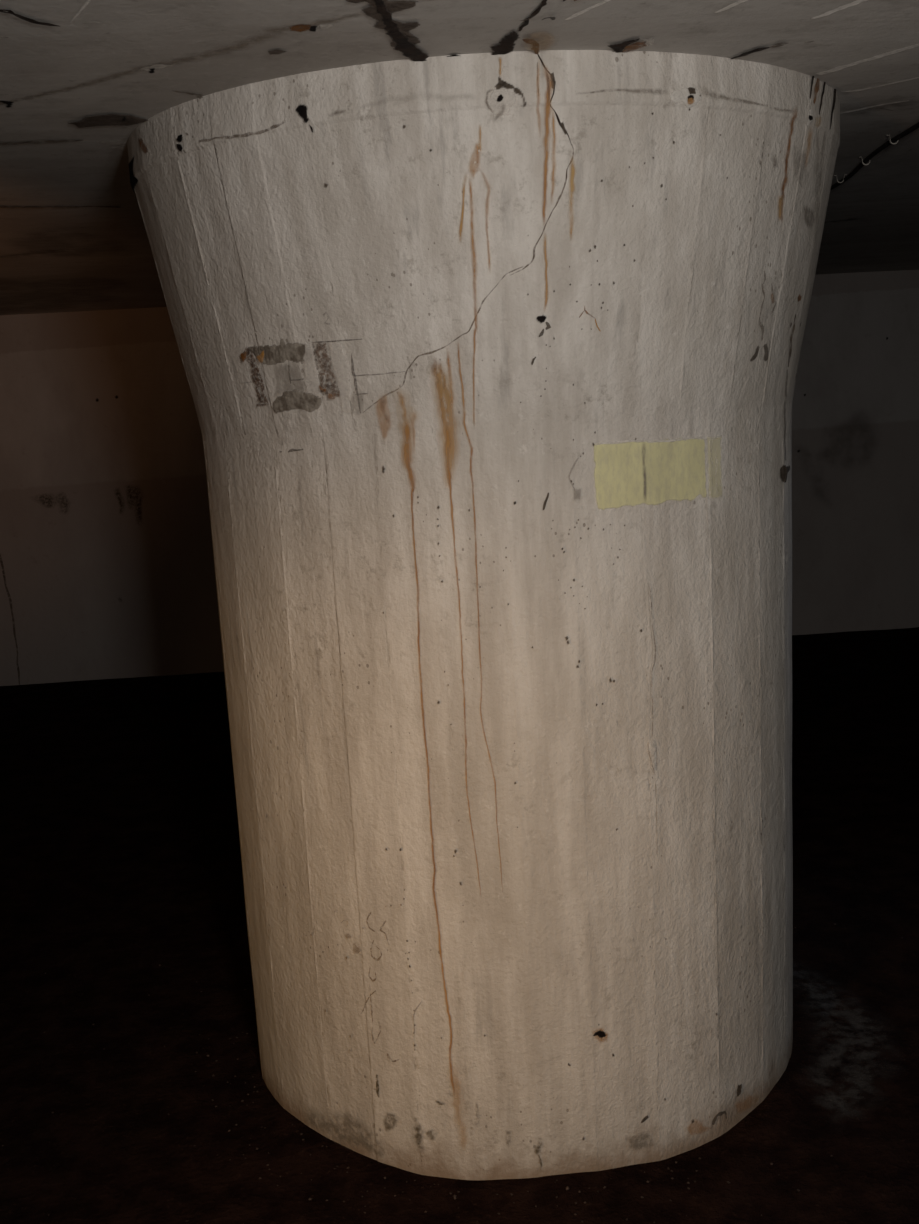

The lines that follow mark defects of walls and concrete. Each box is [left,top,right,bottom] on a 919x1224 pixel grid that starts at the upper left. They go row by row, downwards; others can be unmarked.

crack [346,0,429,61]
crack [364,0,576,412]
rust [459,129,490,291]
rust [543,74,555,219]
spalling [241,339,350,413]
rust [433,310,481,667]
rust [401,398,454,1090]